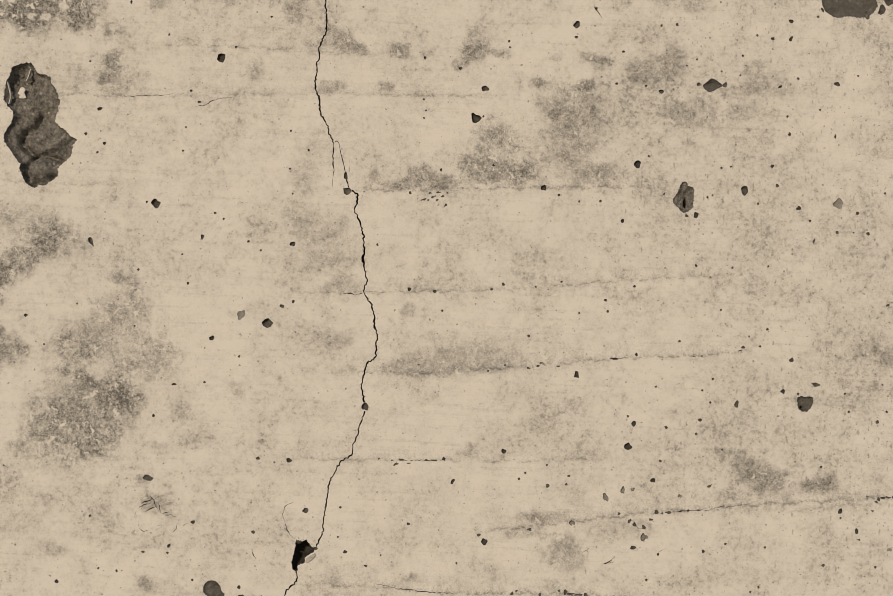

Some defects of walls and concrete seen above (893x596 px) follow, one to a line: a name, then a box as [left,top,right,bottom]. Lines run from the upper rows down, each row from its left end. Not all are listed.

spalling [821,0,893,20]
spalling [3,62,77,188]
spalling [673,181,699,218]
crack [314,0,382,547]
spalling [291,540,318,571]
spalling [203,580,224,596]